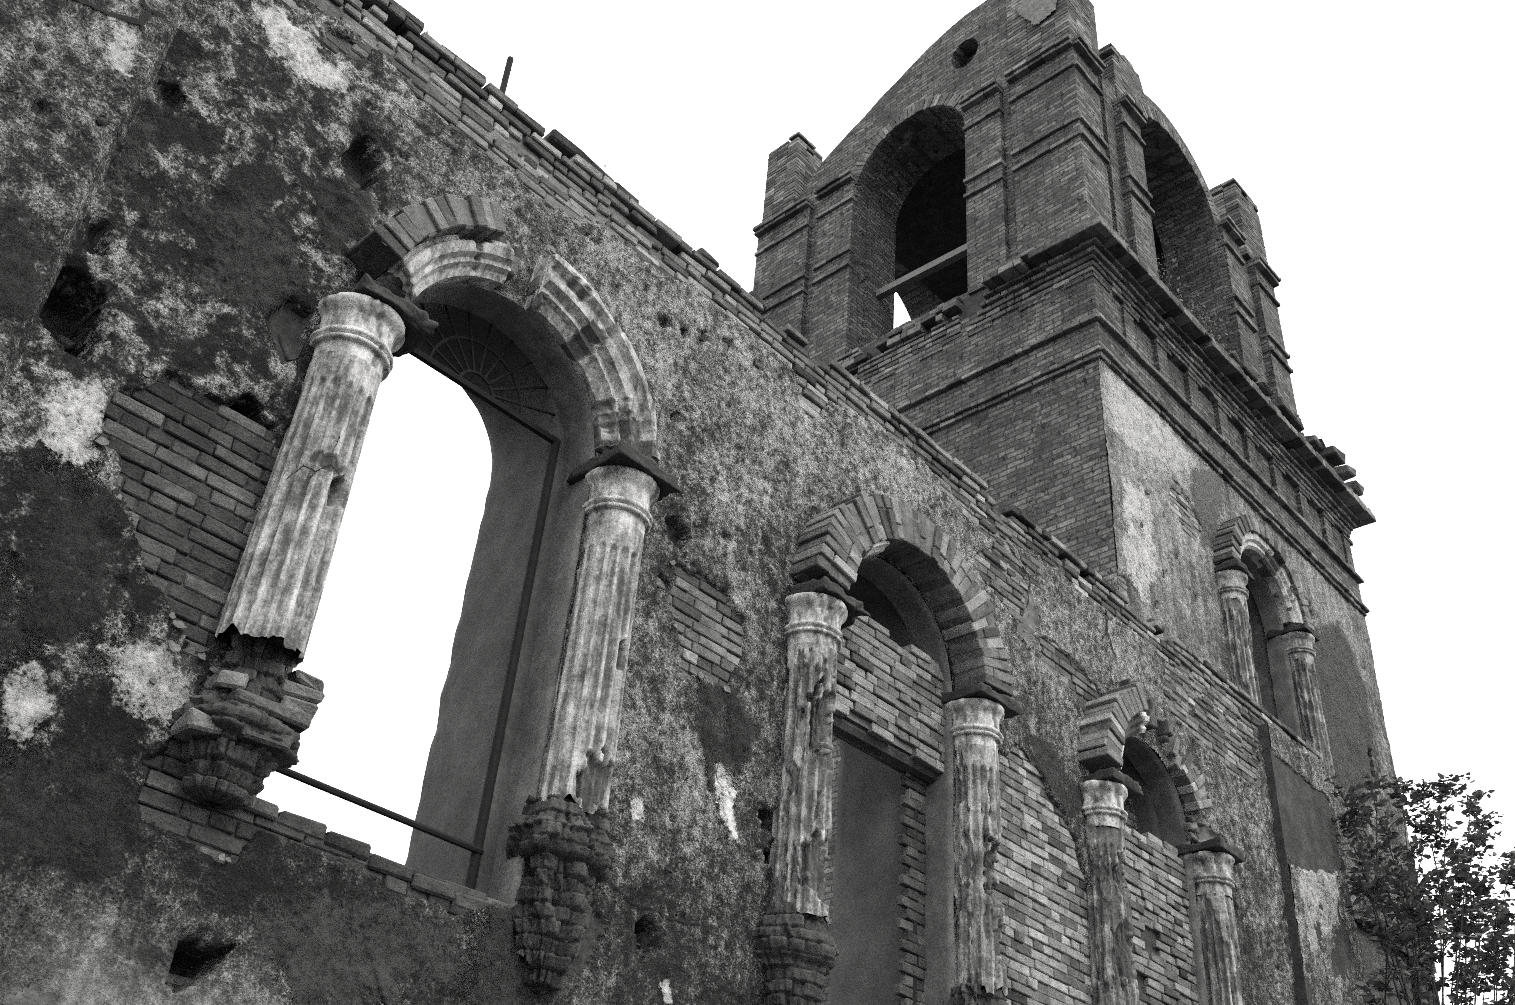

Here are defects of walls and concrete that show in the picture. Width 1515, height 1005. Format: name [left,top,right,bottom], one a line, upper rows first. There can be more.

hole [341,136,380,190]
hole [39,272,99,358]
flaking render [94,371,514,917]
flaking render [656,518,744,693]
hole [165,941,214,990]